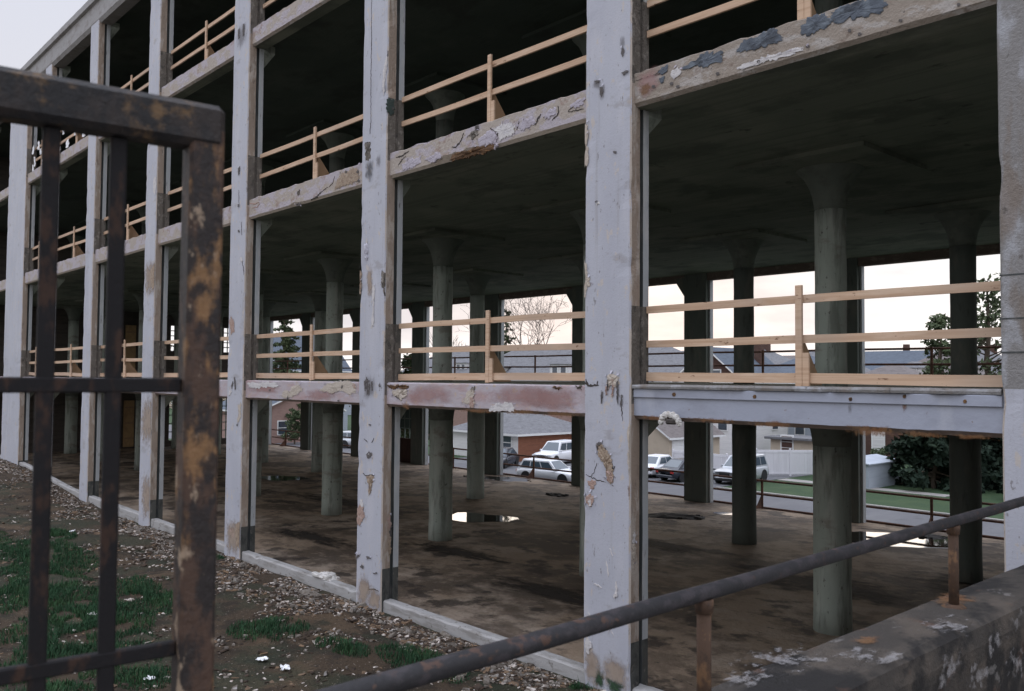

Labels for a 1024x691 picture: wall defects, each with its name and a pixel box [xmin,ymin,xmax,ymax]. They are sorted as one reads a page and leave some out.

peeling [658,0,888,84]
spalling [401,107,556,172]
peeling [461,385,516,413]
spalling [600,370,623,406]
spalling [584,424,630,507]
peeling [357,473,375,527]